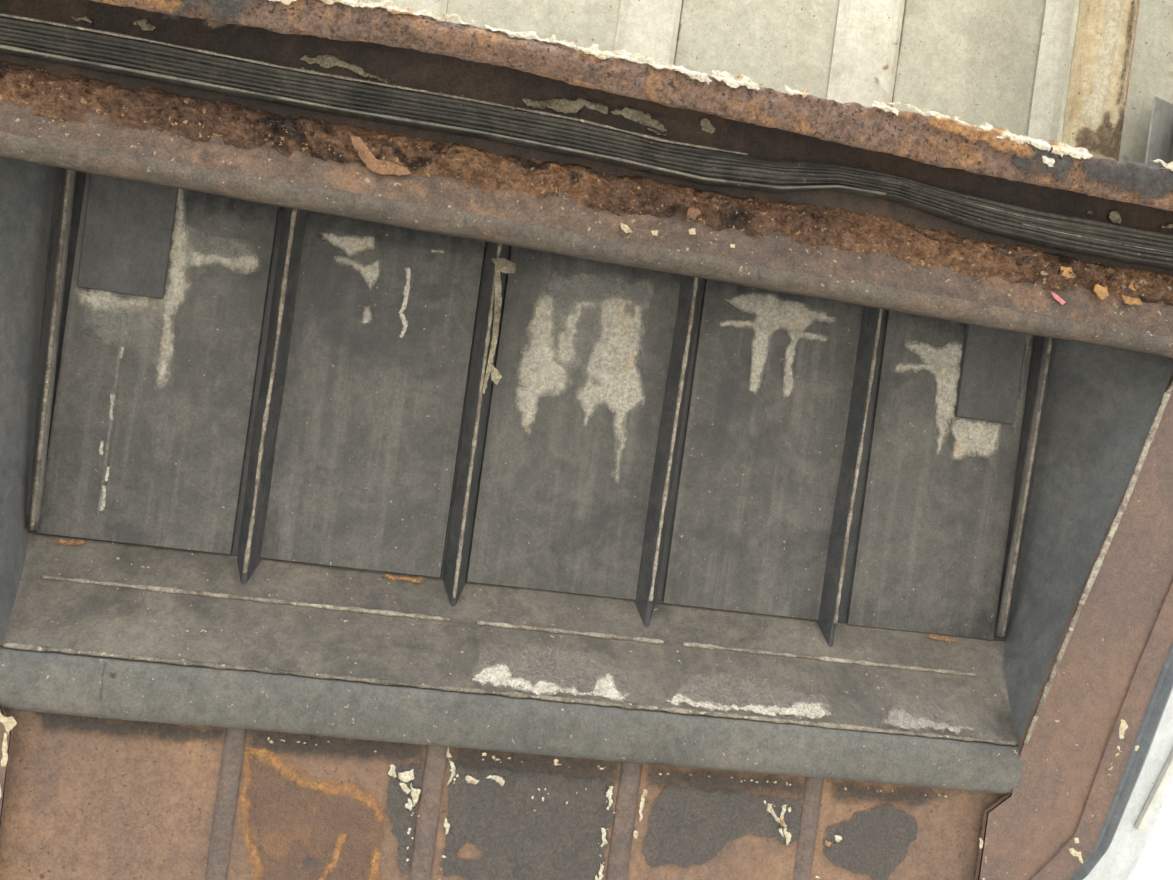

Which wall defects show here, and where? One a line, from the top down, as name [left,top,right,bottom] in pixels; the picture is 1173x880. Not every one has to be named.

corrosion [91,0,1173,211]
corrosion [0,61,1173,306]
water stain [81,189,258,384]
water stain [516,272,653,461]
water stain [720,293,834,396]
water stain [896,343,998,459]
water stain [473,649,627,701]
peeling [0,713,17,766]
peeling [388,764,421,862]
peeling [447,748,523,786]
peeling [595,828,609,880]
peeling [764,801,792,845]